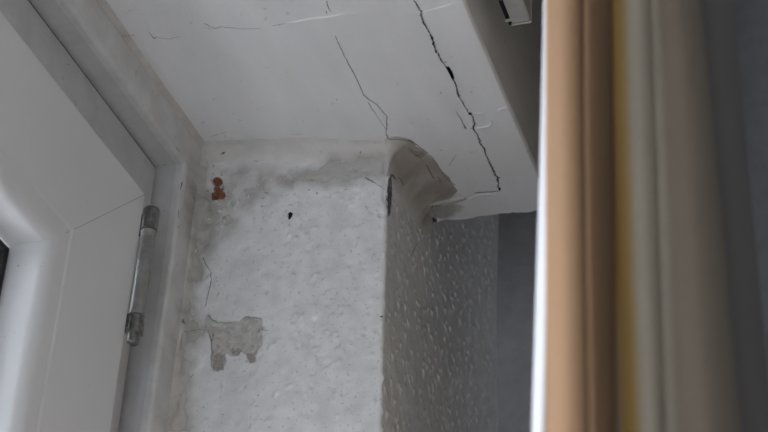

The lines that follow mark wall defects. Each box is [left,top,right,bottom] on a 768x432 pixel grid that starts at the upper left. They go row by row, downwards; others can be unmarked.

crack [335,36,388,139]
crack [414,1,501,193]
rust [211,173,229,200]
peeling [206,315,263,371]